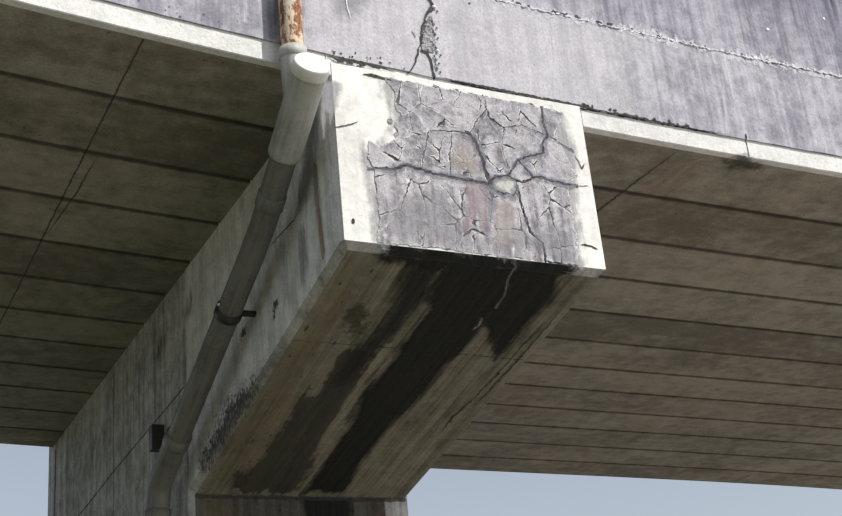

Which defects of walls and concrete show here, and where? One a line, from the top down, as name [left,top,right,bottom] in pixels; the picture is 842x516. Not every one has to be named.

crack [363,0,442,86]
crack [0,39,144,323]
crack [367,94,587,263]
damp [556,118,581,246]
damp [195,152,584,516]